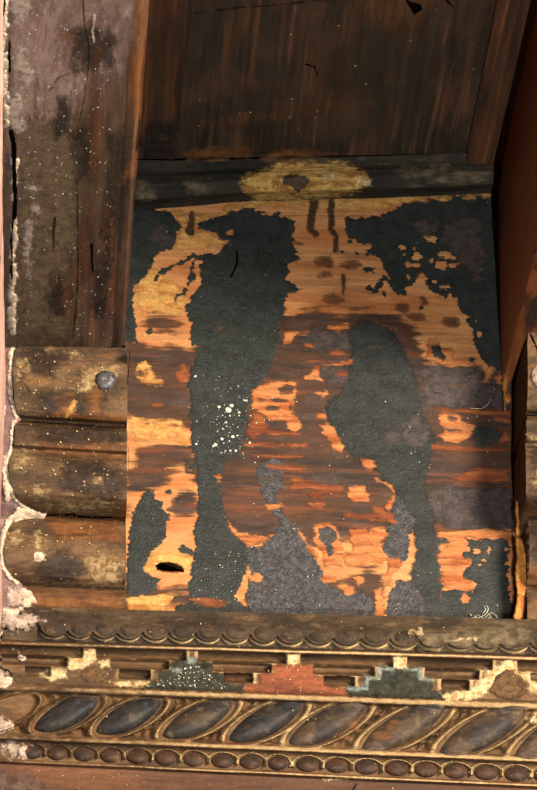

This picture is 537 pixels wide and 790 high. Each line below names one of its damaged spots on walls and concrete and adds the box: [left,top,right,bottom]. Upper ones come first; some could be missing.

crack [49,0,96,142]
water stain [307,199,362,303]
water stain [0,0,204,636]
peeling [123,193,514,619]
water stain [219,304,516,546]
water stain [326,565,387,614]
water stain [0,670,12,689]
water stain [39,650,150,688]
water stain [0,715,27,760]